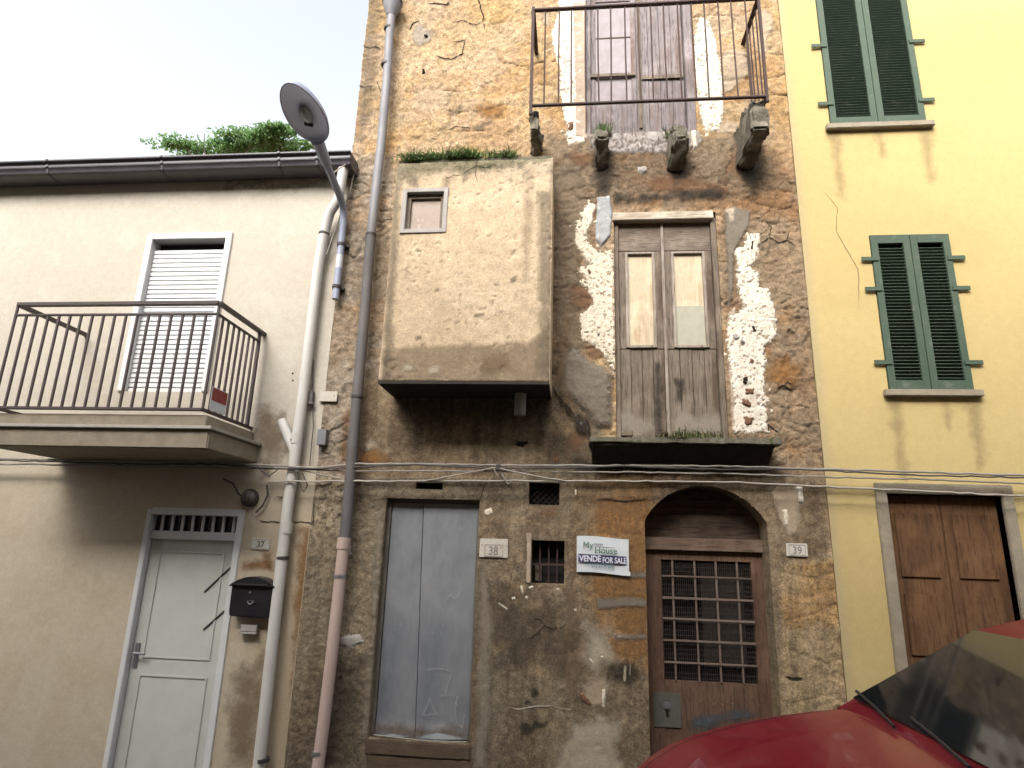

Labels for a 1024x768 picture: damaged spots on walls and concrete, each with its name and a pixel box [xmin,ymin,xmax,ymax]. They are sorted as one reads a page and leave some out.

crack [428,0,485,60]
flaking render [543,0,595,165]
spalling [608,131,669,153]
flaking render [687,15,748,150]
flaking render [569,200,615,378]
flaking render [724,232,778,435]